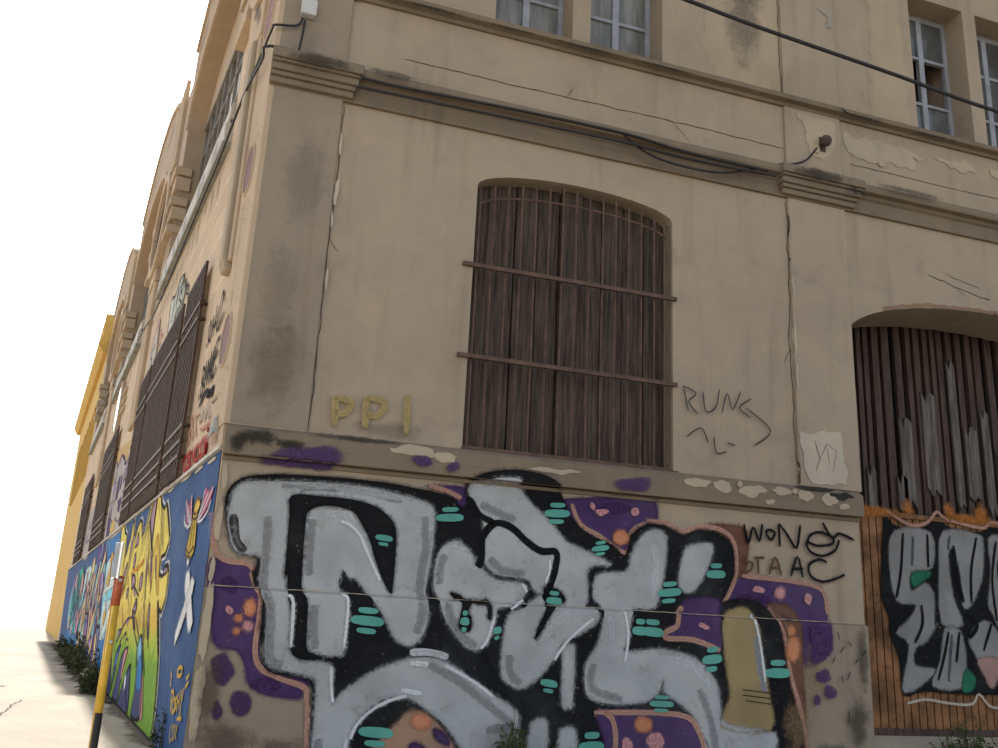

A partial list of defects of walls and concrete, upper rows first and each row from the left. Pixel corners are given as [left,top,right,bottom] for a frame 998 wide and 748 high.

crack [407,59,780,148]
crack [784,204,837,484]
spalling [390,444,456,463]
spalling [528,467,580,475]
spalling [684,478,854,510]
rust [864,500,914,516]
rust [944,504,990,525]